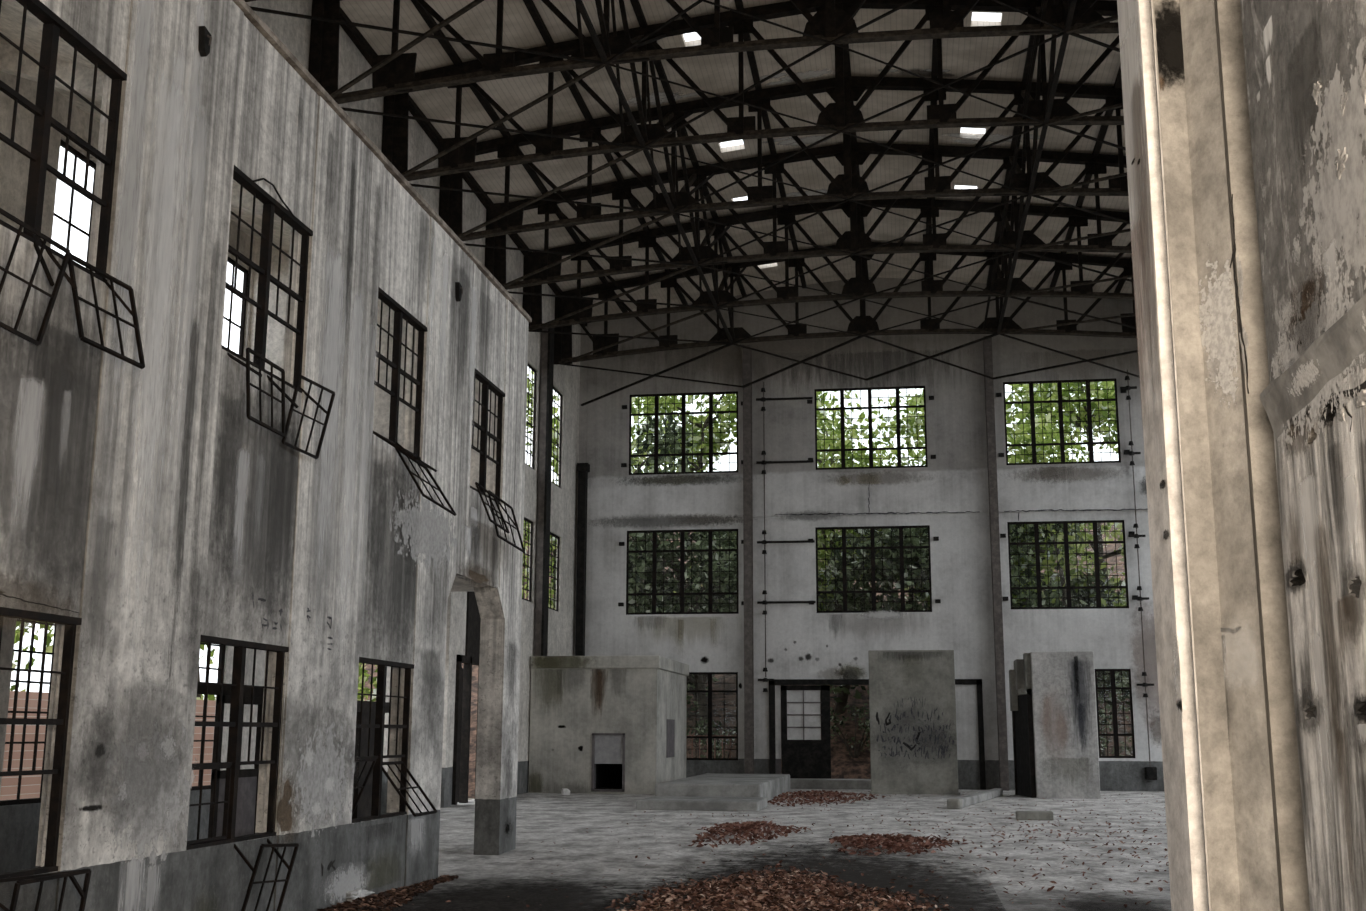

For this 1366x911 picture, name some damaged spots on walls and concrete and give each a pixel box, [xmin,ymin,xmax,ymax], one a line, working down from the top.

peeling [1271,36,1366,380]
peeling [1274,352,1366,446]